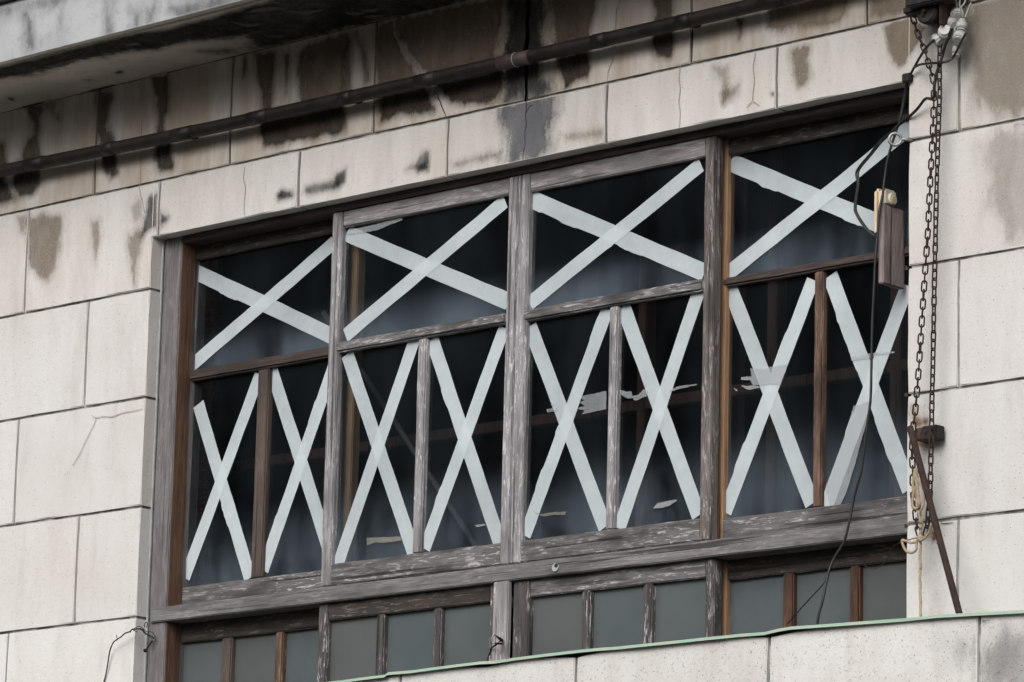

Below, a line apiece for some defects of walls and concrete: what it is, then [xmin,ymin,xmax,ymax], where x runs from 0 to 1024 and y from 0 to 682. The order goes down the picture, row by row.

water stain [0,0,595,109]
crack [747,52,759,107]
water stain [792,46,809,85]
water stain [872,0,925,66]
water stain [151,75,174,171]
water stain [260,106,346,146]
water stain [379,62,555,162]
crack [522,103,532,160]
water stain [306,171,345,192]
water stain [26,214,61,278]
water stain [131,197,166,252]
crack [72,408,142,466]